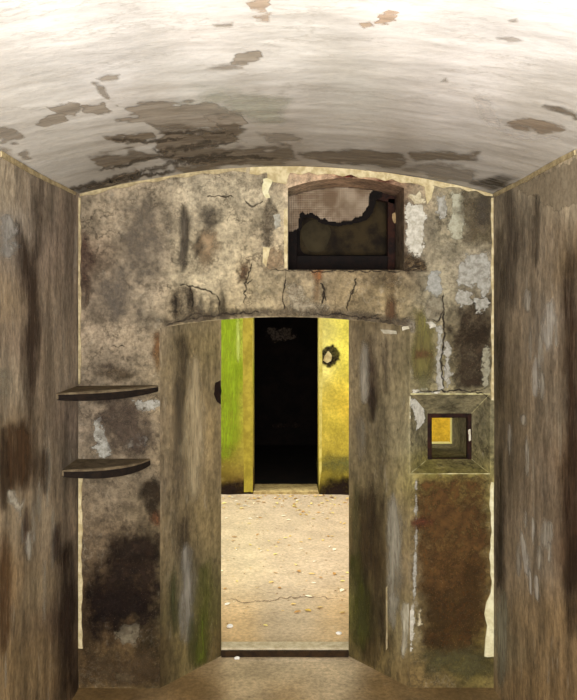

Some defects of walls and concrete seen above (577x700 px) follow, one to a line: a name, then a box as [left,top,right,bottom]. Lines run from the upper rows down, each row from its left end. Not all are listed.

crack [168,264,258,325]
peeling [0,100,577,430]
crack [276,265,423,326]
crack [420,295,488,398]
leakage [52,527,160,693]